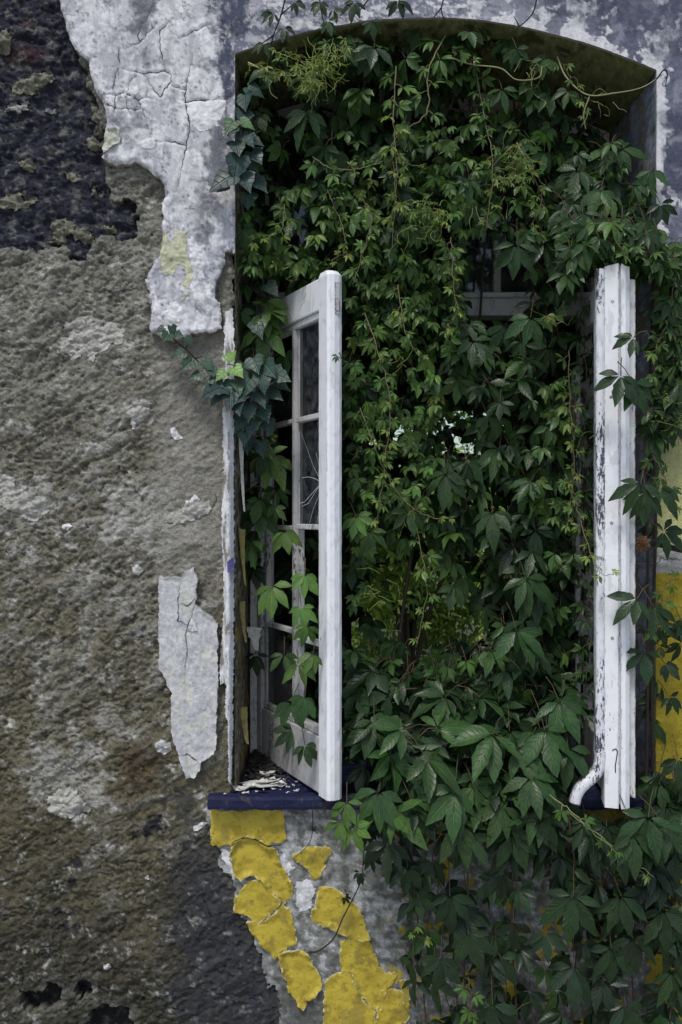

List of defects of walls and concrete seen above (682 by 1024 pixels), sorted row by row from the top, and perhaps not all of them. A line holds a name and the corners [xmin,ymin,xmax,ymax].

flaking render [0,0,140,261]
crack [106,15,215,187]
crack [177,581,195,680]
flaking render [155,567,220,779]
spalling [24,982,62,1007]
spalling [78,979,93,994]
spalling [89,1003,134,1024]
peeling [193,809,410,1024]